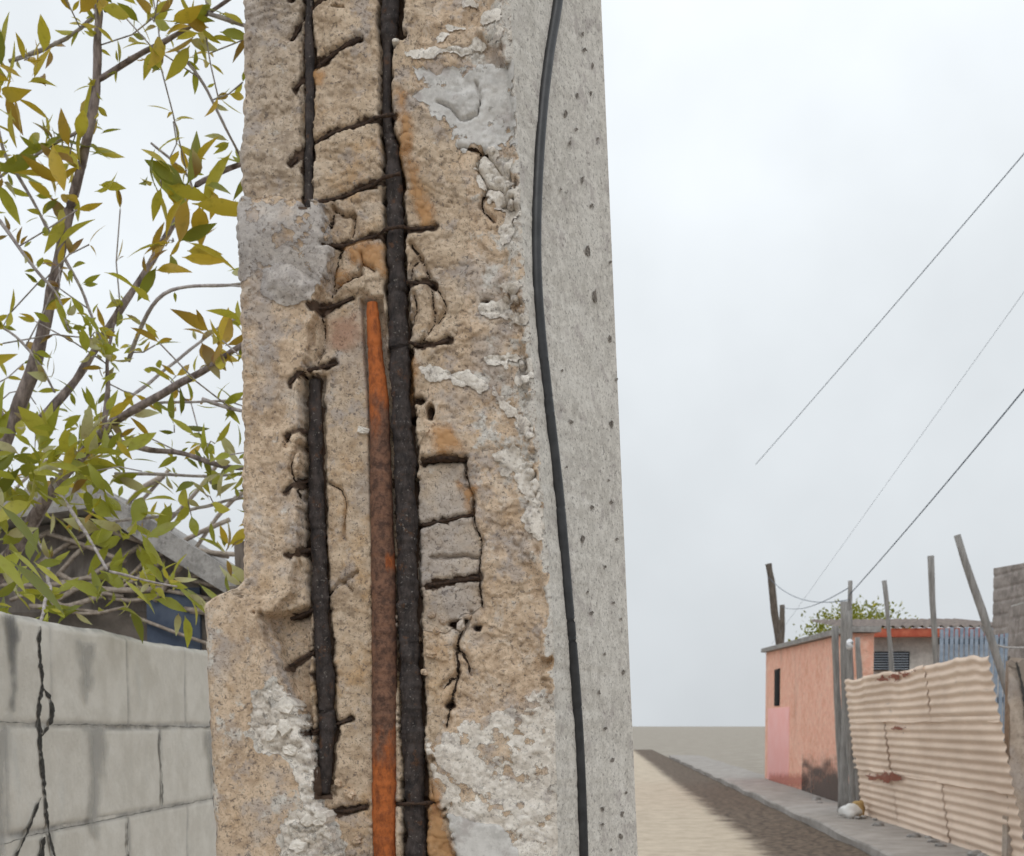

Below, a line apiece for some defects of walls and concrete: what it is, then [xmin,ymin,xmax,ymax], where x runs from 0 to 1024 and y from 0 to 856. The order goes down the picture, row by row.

rust [287,127,341,176]
rust [306,300,346,317]
rust [356,0,468,509]
crack [467,147,492,220]
rust [288,358,338,525]
spalling [239,0,558,856]
crack [0,626,213,856]
rust [301,610,369,818]
rust [415,485,483,726]
crack [444,463,483,728]
rust [865,771,903,783]
crack [1016,662,1024,703]